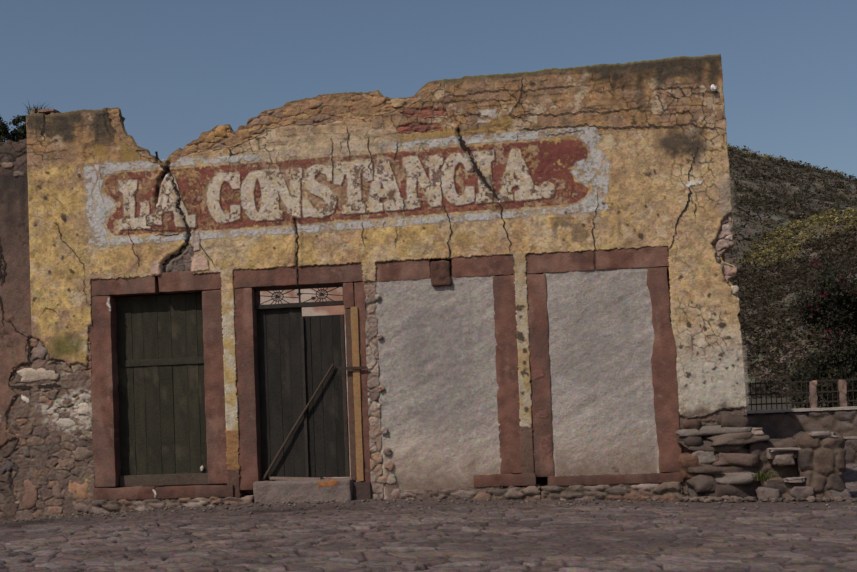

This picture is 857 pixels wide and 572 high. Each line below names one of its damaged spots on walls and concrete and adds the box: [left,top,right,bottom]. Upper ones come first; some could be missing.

crack [446,77,724,251]
water stain [659,131,705,156]
crack [128,151,214,273]
spalling [151,230,209,275]
crack [293,220,301,285]
crack [591,193,599,269]
spalling [712,215,739,297]
crack [0,244,61,397]
spalling [0,326,95,521]